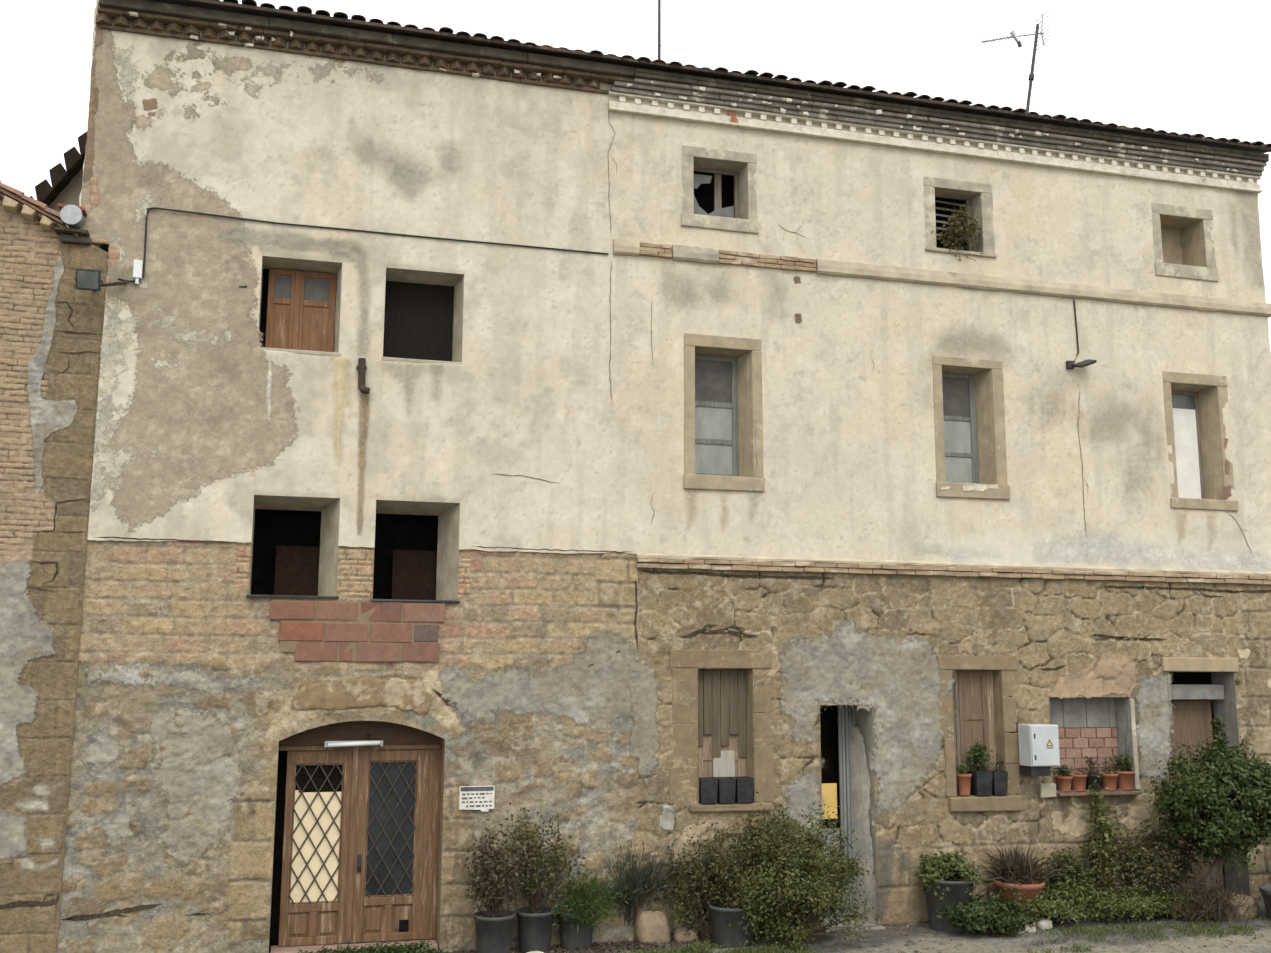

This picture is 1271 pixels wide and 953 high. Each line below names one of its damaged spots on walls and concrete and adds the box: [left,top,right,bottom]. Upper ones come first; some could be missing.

crack [608,100,617,230]
peeling [80,3,382,532]
crack [606,263,614,400]
crack [491,474,560,484]